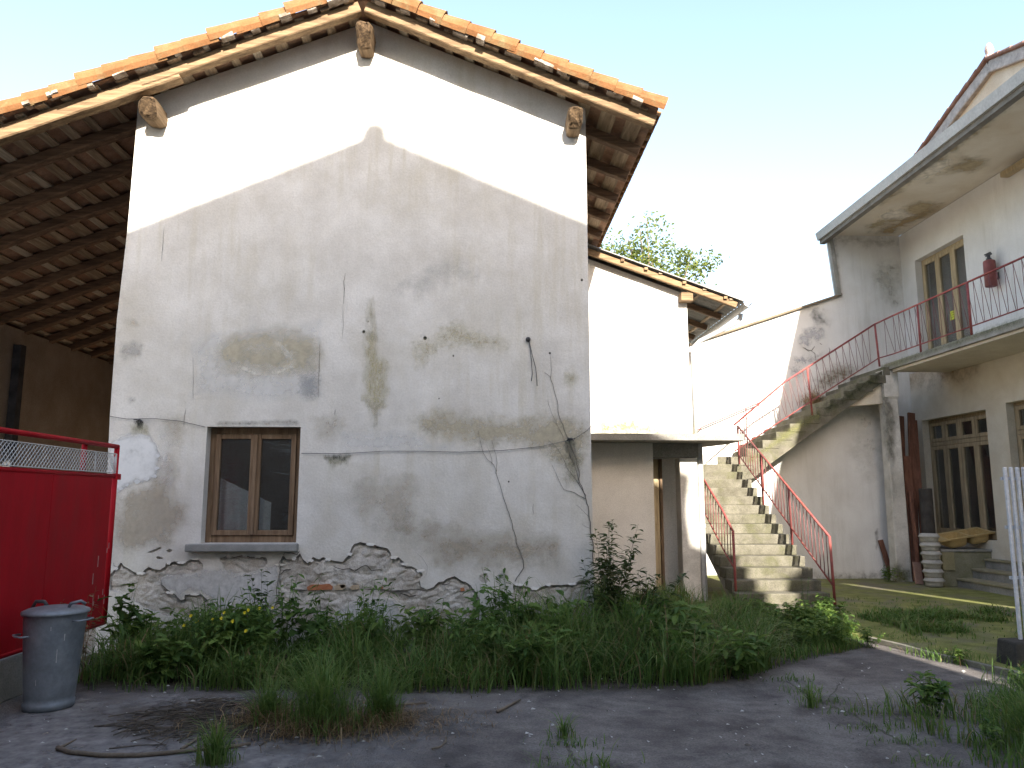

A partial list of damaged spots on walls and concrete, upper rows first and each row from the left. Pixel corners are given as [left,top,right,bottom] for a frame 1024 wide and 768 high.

leakage [870,203,932,233]
peeling [109,435,160,492]
leakage [423,418,583,465]
flaking render [111,547,210,617]
flaking render [221,542,489,628]
flaking render [507,580,592,624]